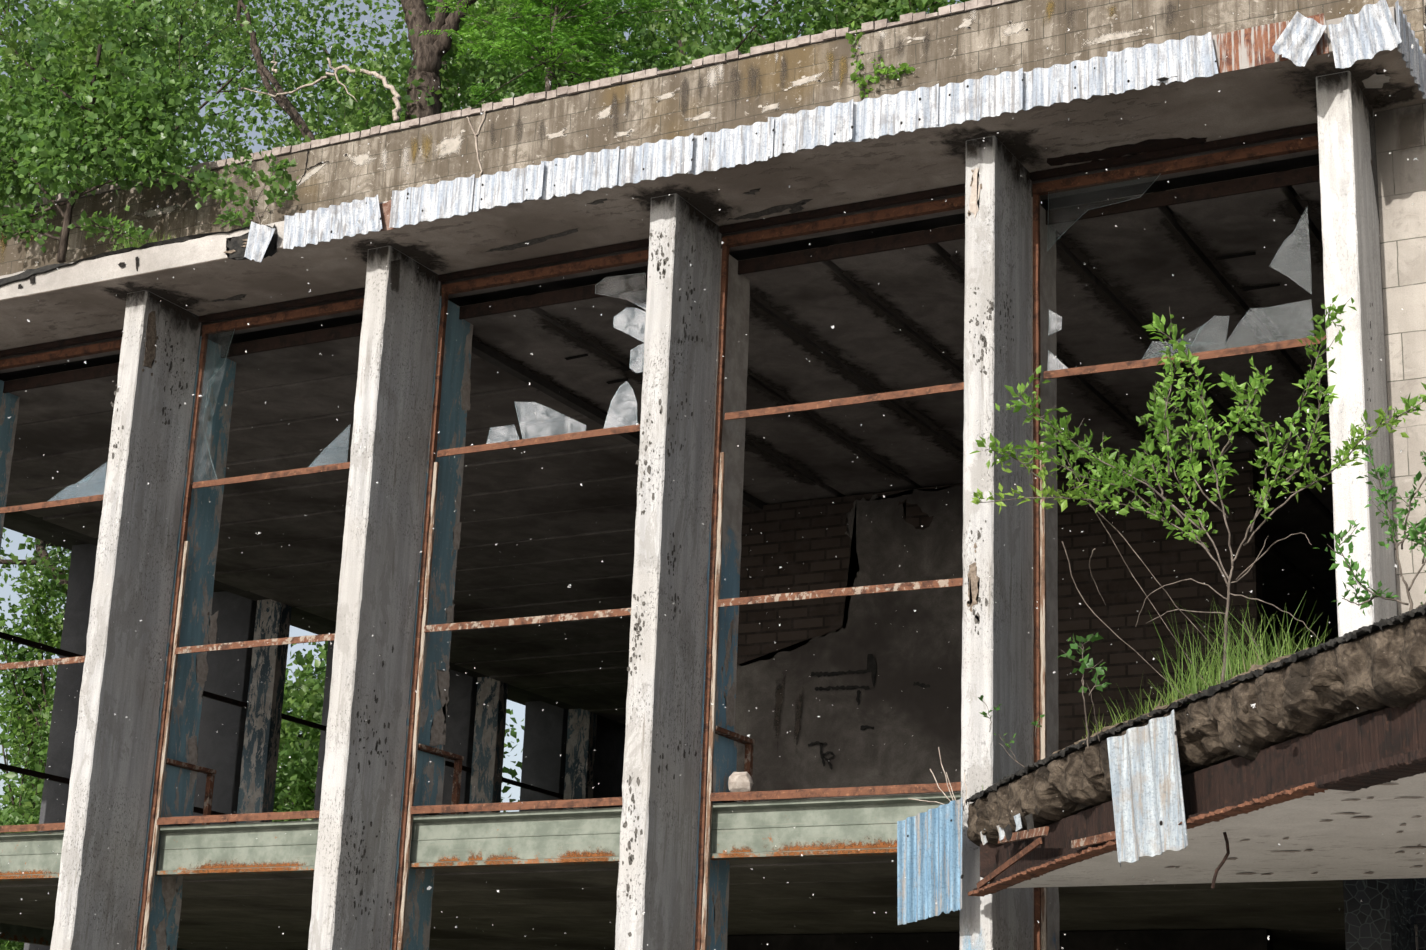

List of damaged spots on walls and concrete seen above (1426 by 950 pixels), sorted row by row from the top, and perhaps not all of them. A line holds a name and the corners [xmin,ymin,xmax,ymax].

damp [681,63,758,114]
damp [612,96,629,127]
damp [941,128,1057,186]
peeling [450,521,462,556]
flaking render [721,485,1426,847]
peeling [430,662,450,750]
corrosion [0,870,56,879]
corrosion [185,860,305,873]
corrosion [433,852,519,866]
corrosion [560,850,615,862]
corrosion [772,840,897,856]
peeling [152,876,178,950]